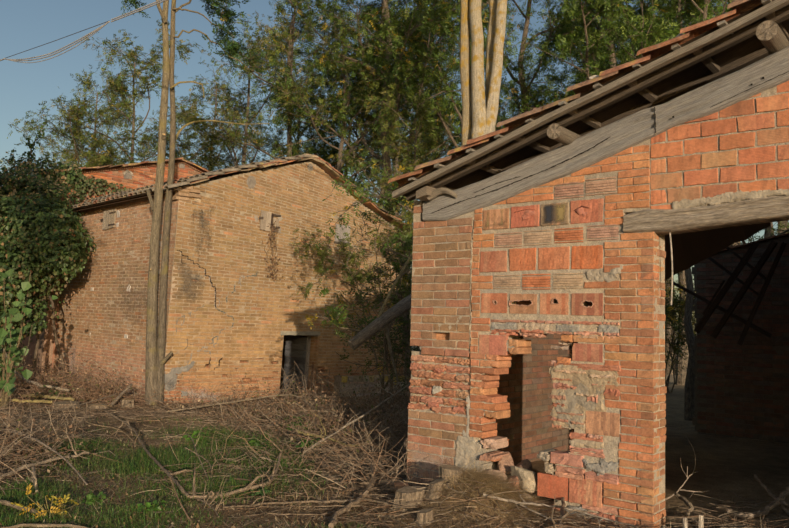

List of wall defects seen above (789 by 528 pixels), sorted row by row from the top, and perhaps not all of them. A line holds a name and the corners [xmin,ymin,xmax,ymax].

crack [176,250,258,370]
spalling [551,342,578,350]
spalling [407,355,470,415]
spalling [479,436,509,461]
spalling [537,448,558,474]